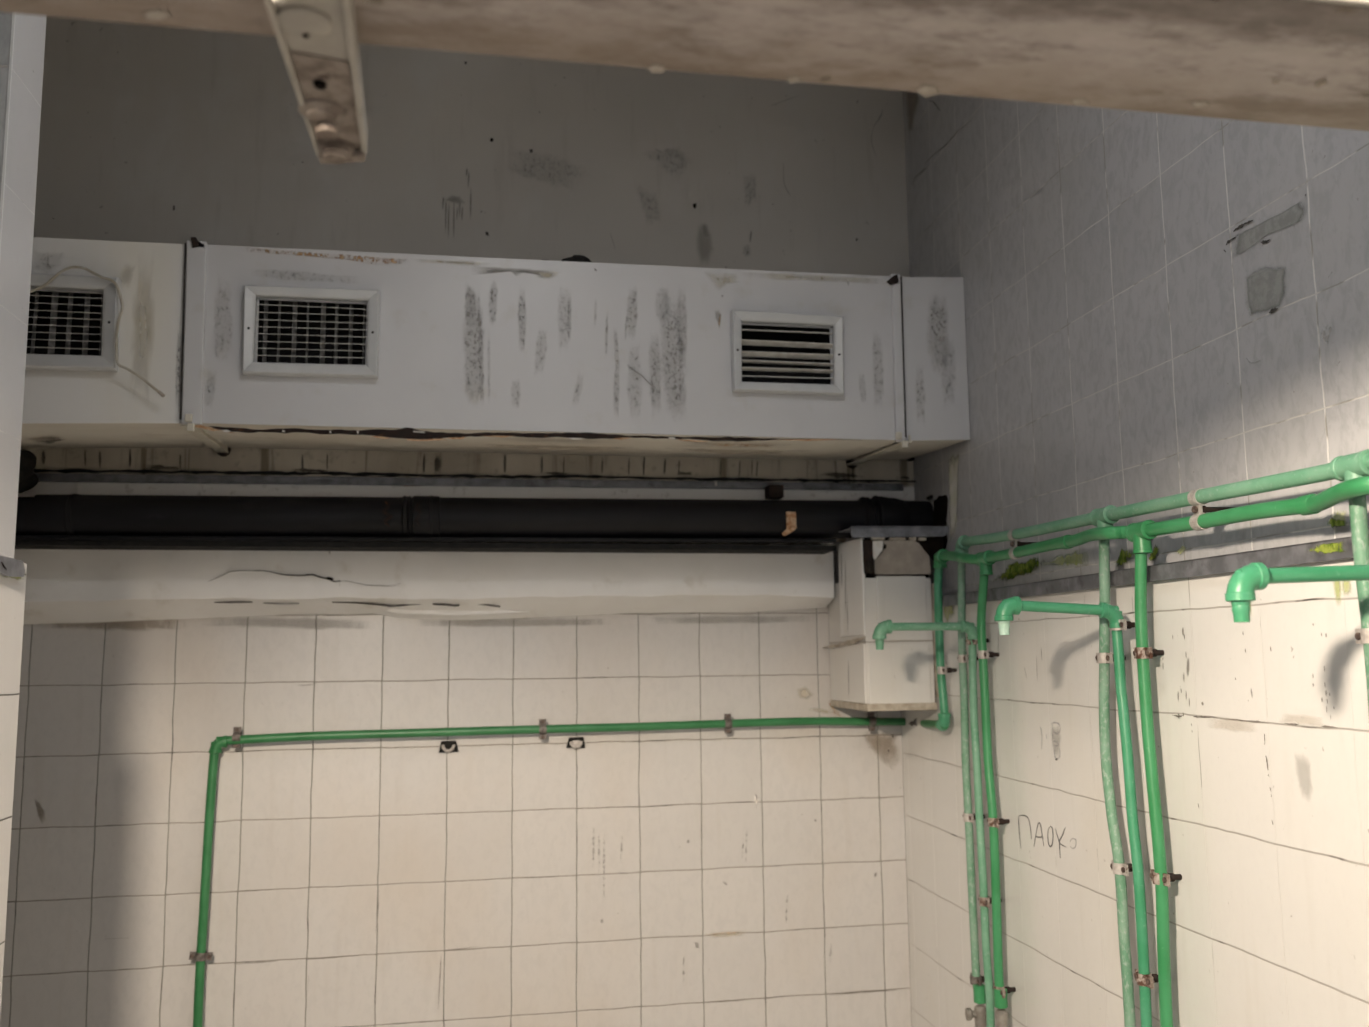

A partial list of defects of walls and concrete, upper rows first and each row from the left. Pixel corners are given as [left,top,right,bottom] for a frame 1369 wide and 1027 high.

crack [208,570,500,607]
damp [193,449,1369,1027]